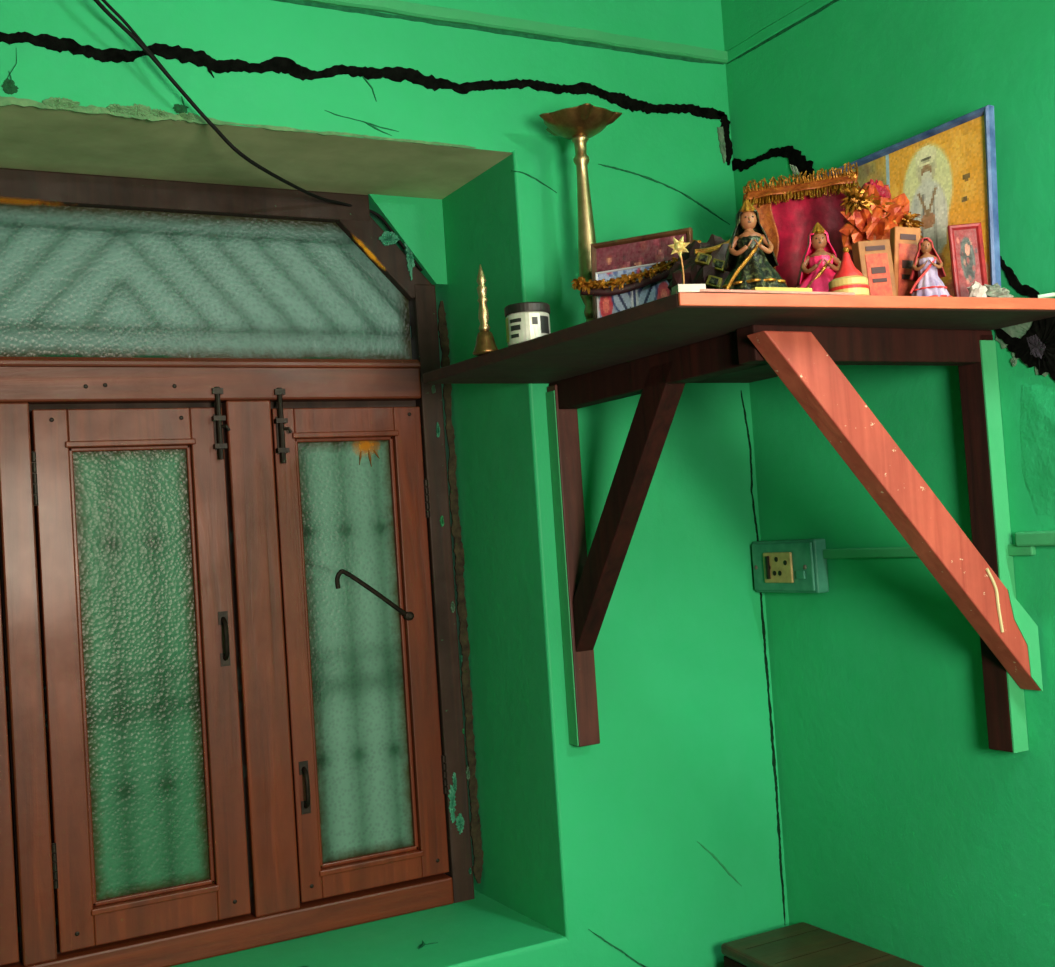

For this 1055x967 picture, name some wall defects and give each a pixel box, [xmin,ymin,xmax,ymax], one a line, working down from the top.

crack [0,31,815,180]
crack [511,170,557,193]
crack [1000,256,1040,298]